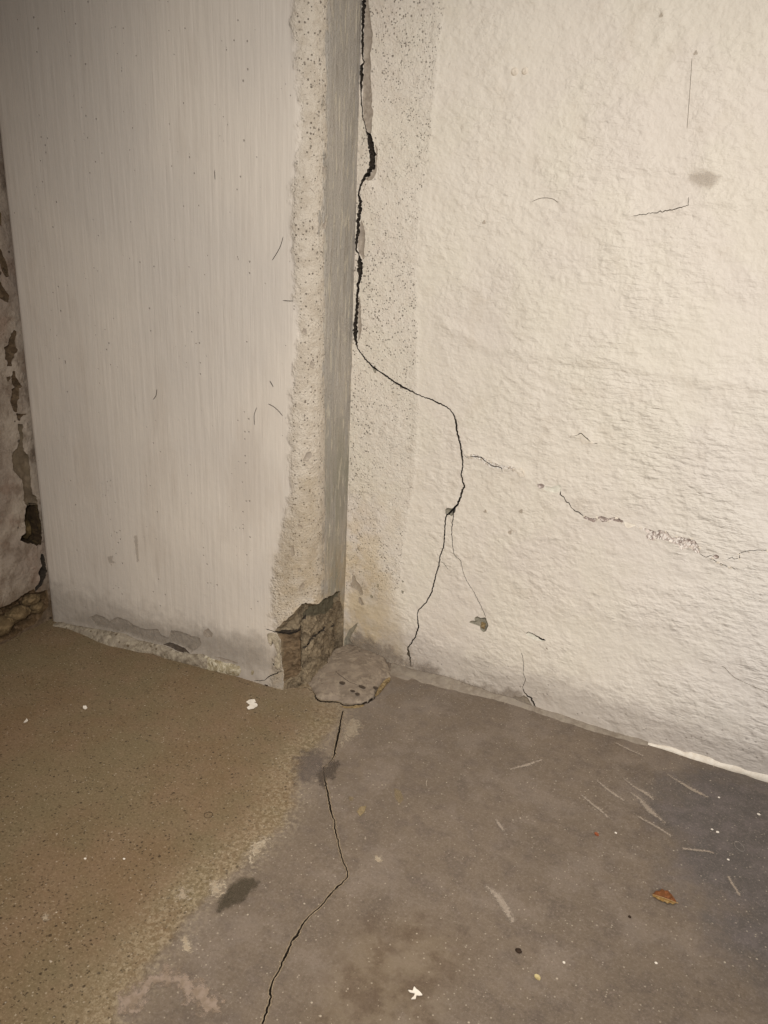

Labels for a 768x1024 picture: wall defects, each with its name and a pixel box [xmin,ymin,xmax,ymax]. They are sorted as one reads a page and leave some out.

peeling [0,249,9,302]
crack [353,0,768,667]
peeling [4,330,42,546]
spalling [0,589,49,642]
peeling [89,614,213,653]
spalling [267,545,379,690]
water stain [209,878,257,912]
crack [256,671,377,1024]